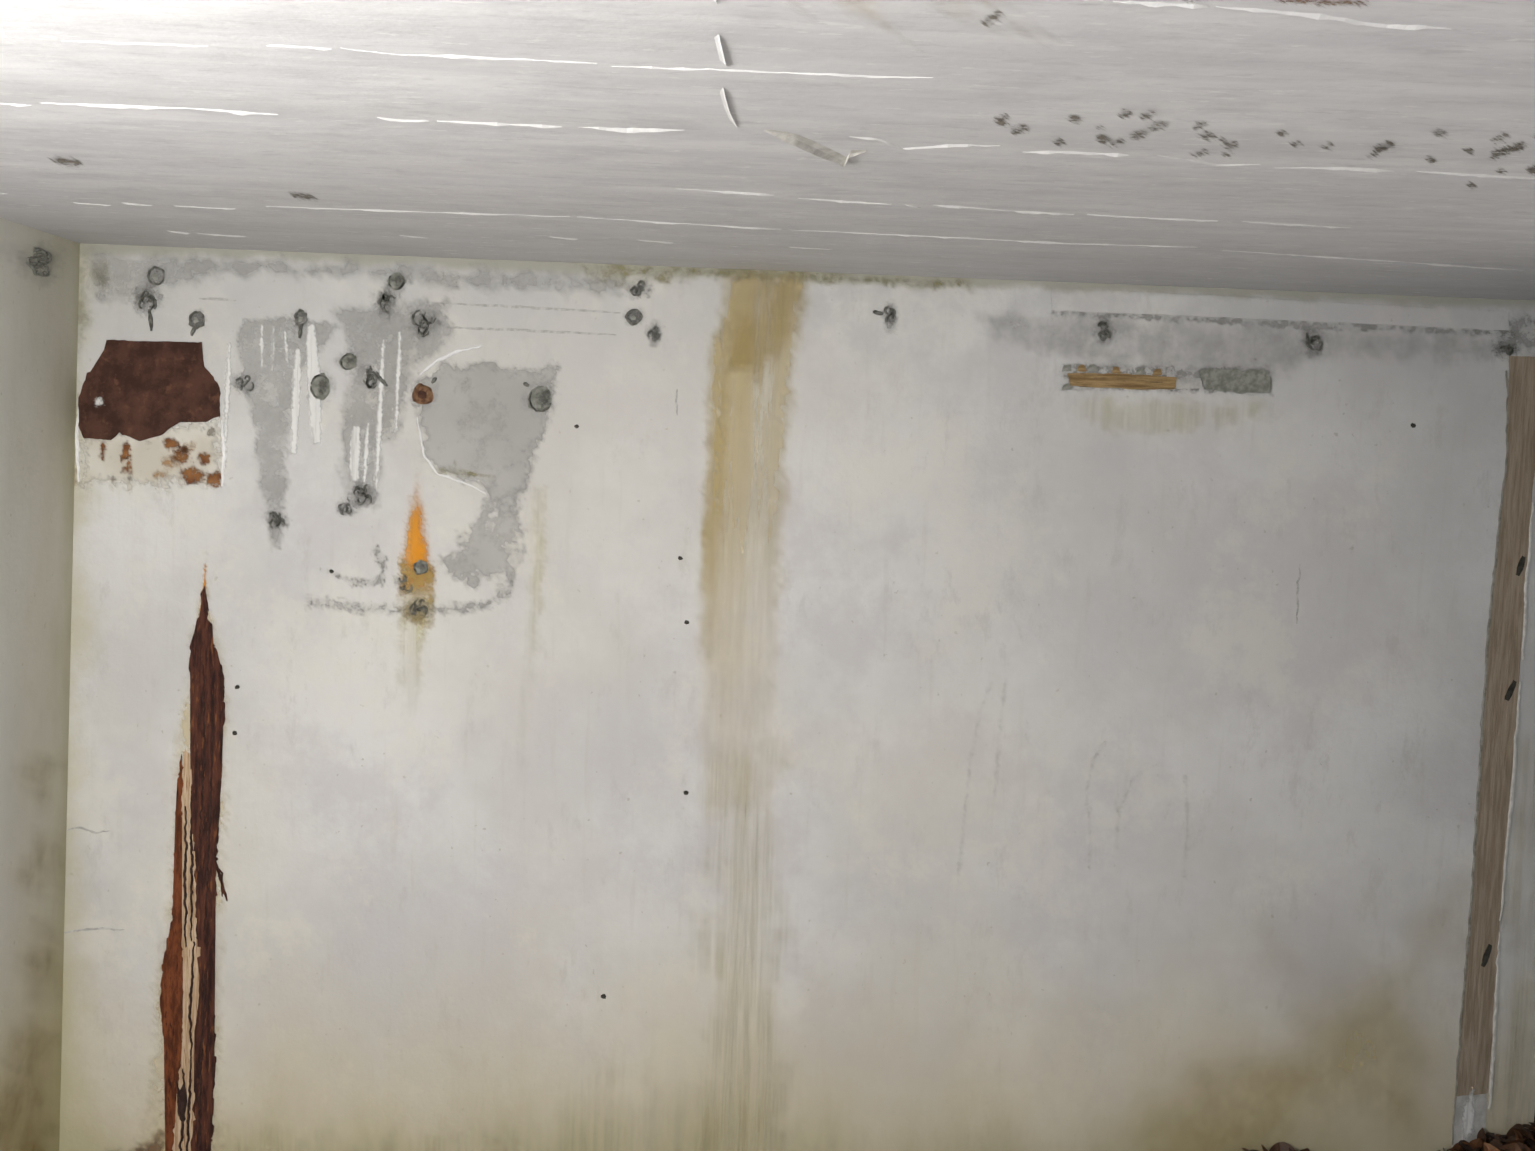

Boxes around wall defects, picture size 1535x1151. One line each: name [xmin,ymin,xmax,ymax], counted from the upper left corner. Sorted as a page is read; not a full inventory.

peeling [1083,0,1451,30]
peeling [292,207,510,215]
damp [715,276,801,493]
peeling [79,419,222,490]
peeling [239,304,559,613]
corrosion [400,505,433,604]